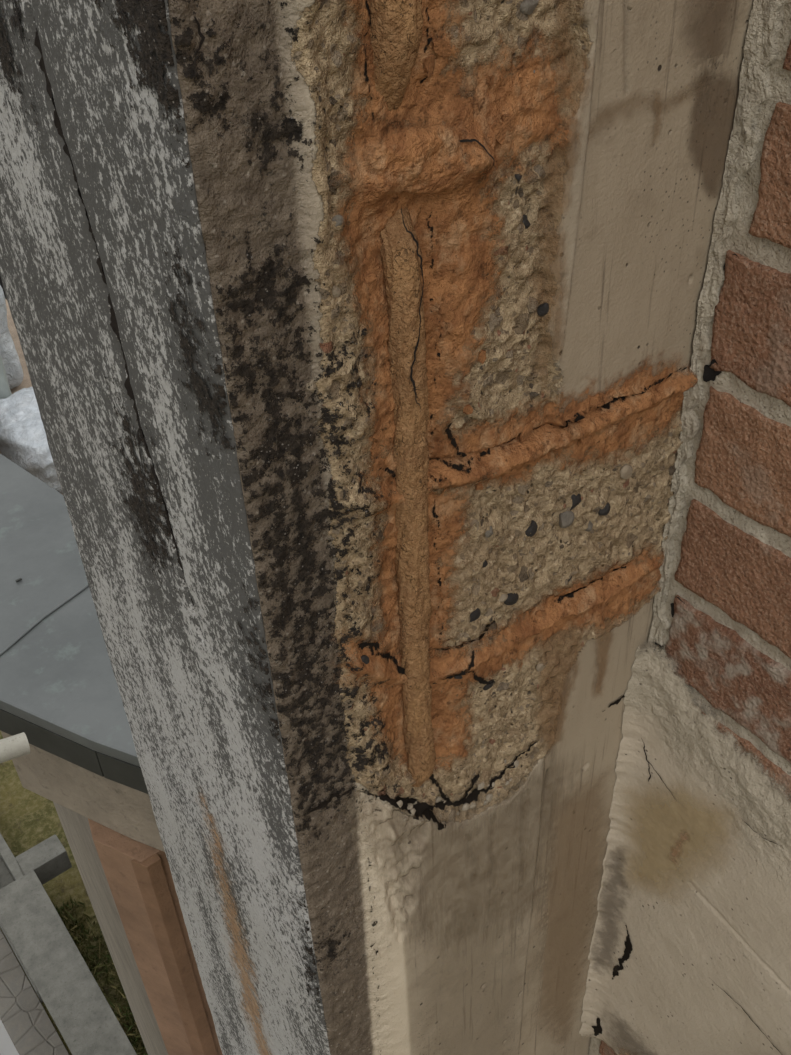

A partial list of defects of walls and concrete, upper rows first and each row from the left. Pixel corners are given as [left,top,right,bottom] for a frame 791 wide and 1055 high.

damp [94,0,327,182]
spalling [441,0,594,127]
damp [693,81,738,189]
damp [98,364,189,607]
damp [148,231,401,856]
crack [358,642,407,676]
spalling [291,0,570,823]
corrosion [338,0,698,770]
crack [401,208,687,685]
spalling [429,407,683,659]
crack [308,740,539,833]
crack [612,925,633,979]